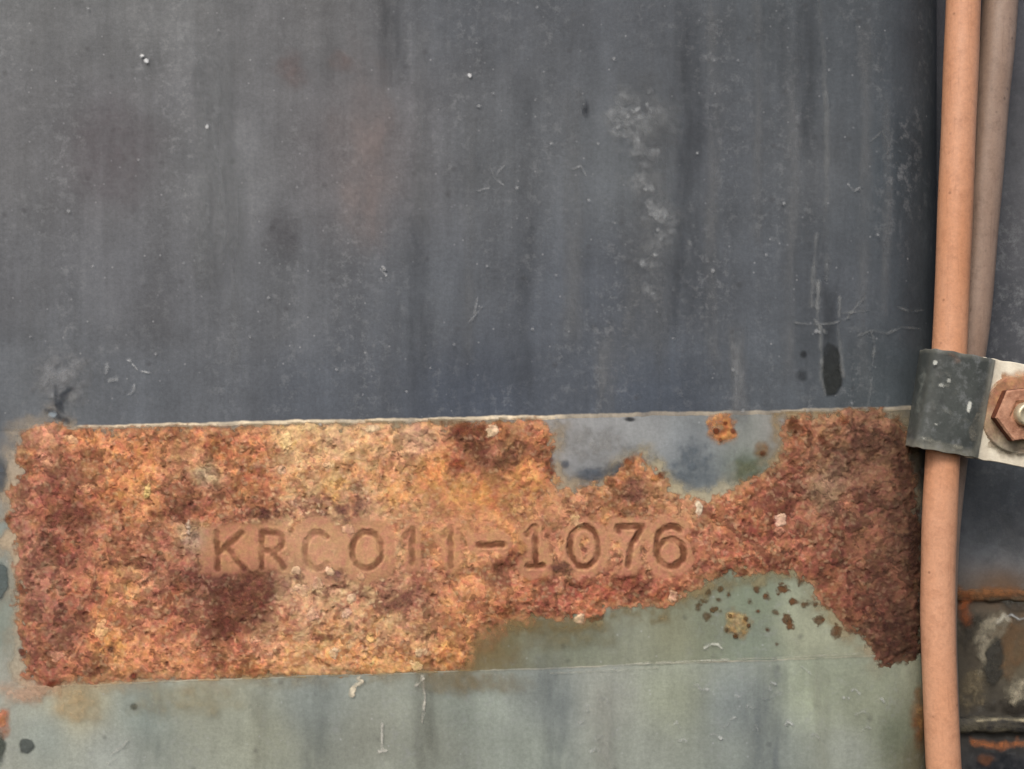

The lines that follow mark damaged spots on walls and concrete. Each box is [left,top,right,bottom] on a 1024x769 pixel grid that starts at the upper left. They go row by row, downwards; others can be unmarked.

water stain [822,308,843,395]
corrosion [0,407,921,701]
corrosion [957,586,1024,622]
corrosion [970,740,1024,761]